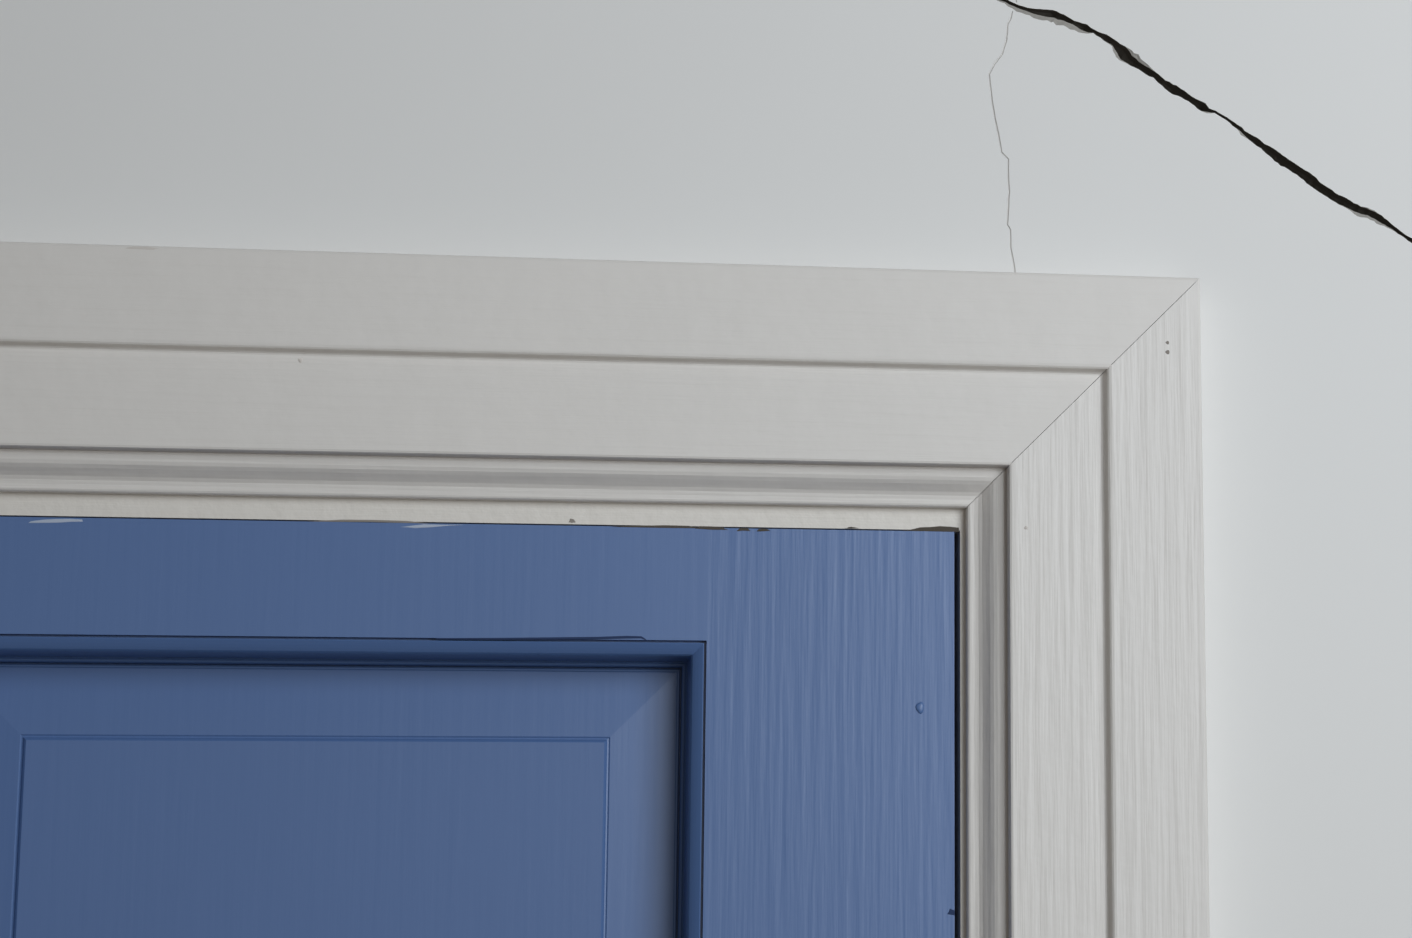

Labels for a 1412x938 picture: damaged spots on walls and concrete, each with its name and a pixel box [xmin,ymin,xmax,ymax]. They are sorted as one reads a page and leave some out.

crack [989,0,1412,273]